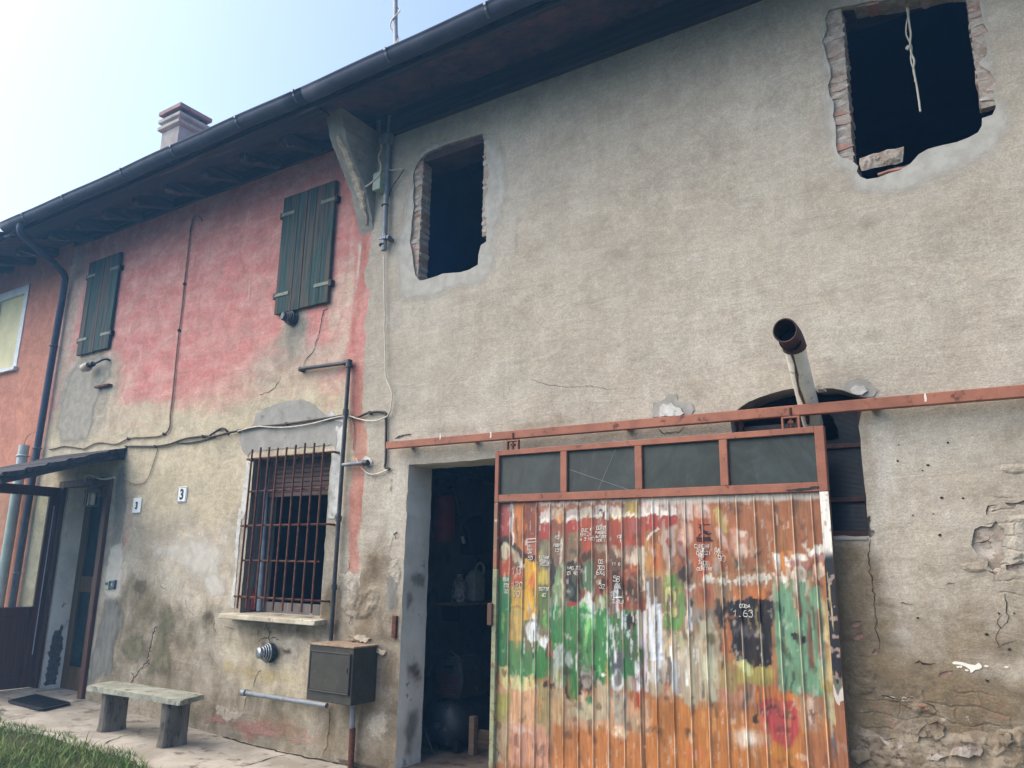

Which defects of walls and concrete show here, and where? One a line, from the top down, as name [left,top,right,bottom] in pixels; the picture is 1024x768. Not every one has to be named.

crack [303,304,328,366]
peeling [44,625,63,686]
crack [130,625,157,683]
water stain [156,538,224,596]
crack [867,539,880,654]
flaking render [971,521,1024,575]
crack [995,599,1014,649]
flaking render [850,698,1024,768]